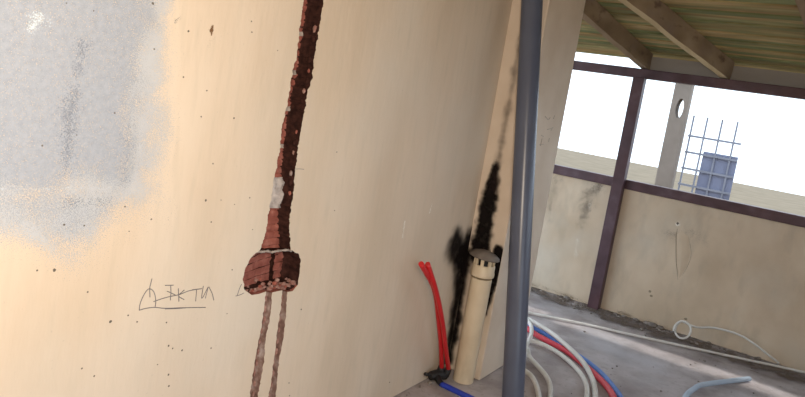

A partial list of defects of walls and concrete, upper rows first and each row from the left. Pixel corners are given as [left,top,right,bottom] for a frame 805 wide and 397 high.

water stain [0,0,181,281]